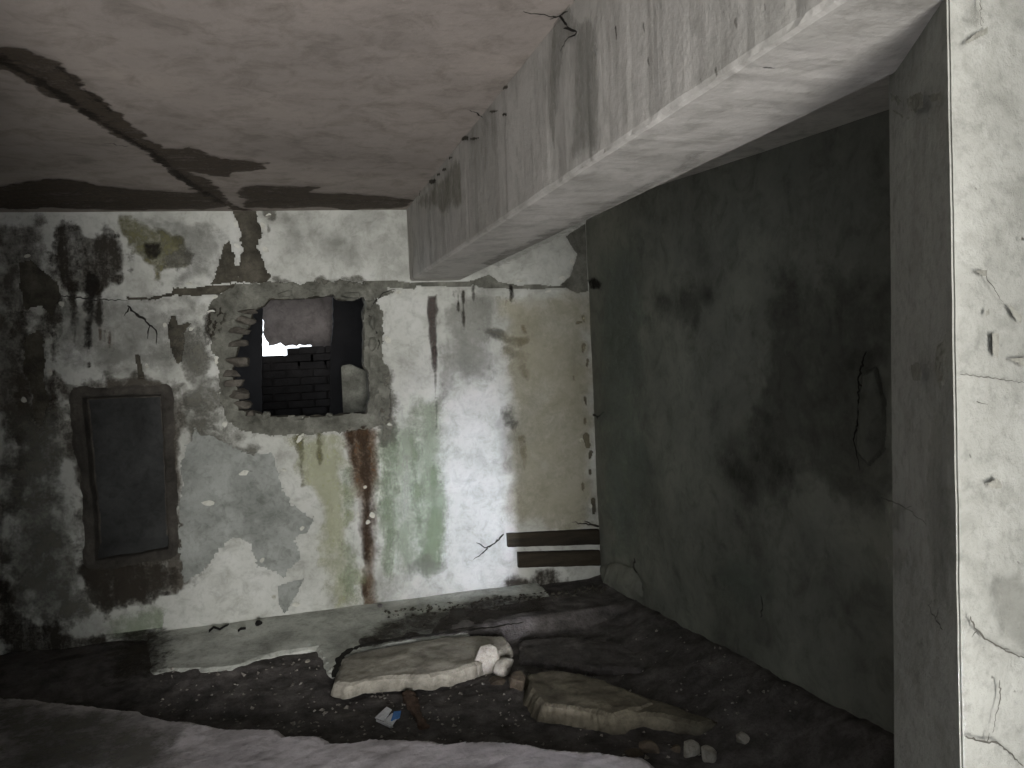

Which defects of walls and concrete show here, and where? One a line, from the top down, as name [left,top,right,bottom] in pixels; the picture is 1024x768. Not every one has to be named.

crack [523,11,577,51]
crack [63,295,157,343]
leakage [0,47,413,684]
rust [427,296,438,381]
peeling [126,211,588,613]
crack [853,351,867,470]
flaking render [579,396,596,515]
rust [344,427,383,604]
crack [473,534,504,560]
crack [970,616,1024,658]
crack [965,680,1023,766]